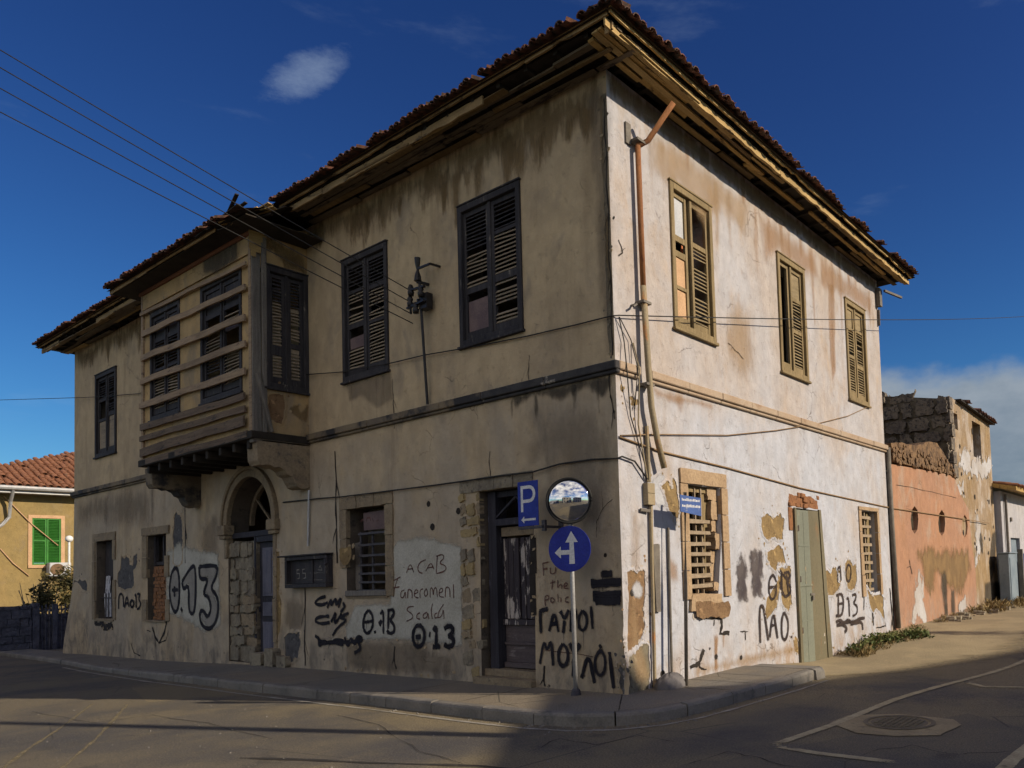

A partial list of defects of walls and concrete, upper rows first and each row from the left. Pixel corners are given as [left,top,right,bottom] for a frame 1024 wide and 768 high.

water stain [314,79,602,245]
water stain [610,77,875,287]
spalling [651,472,681,527]
spalling [614,555,665,695]
spalling [692,600,731,620]
spalling [758,505,793,623]
spalling [826,550,885,622]
water stain [942,574,955,616]